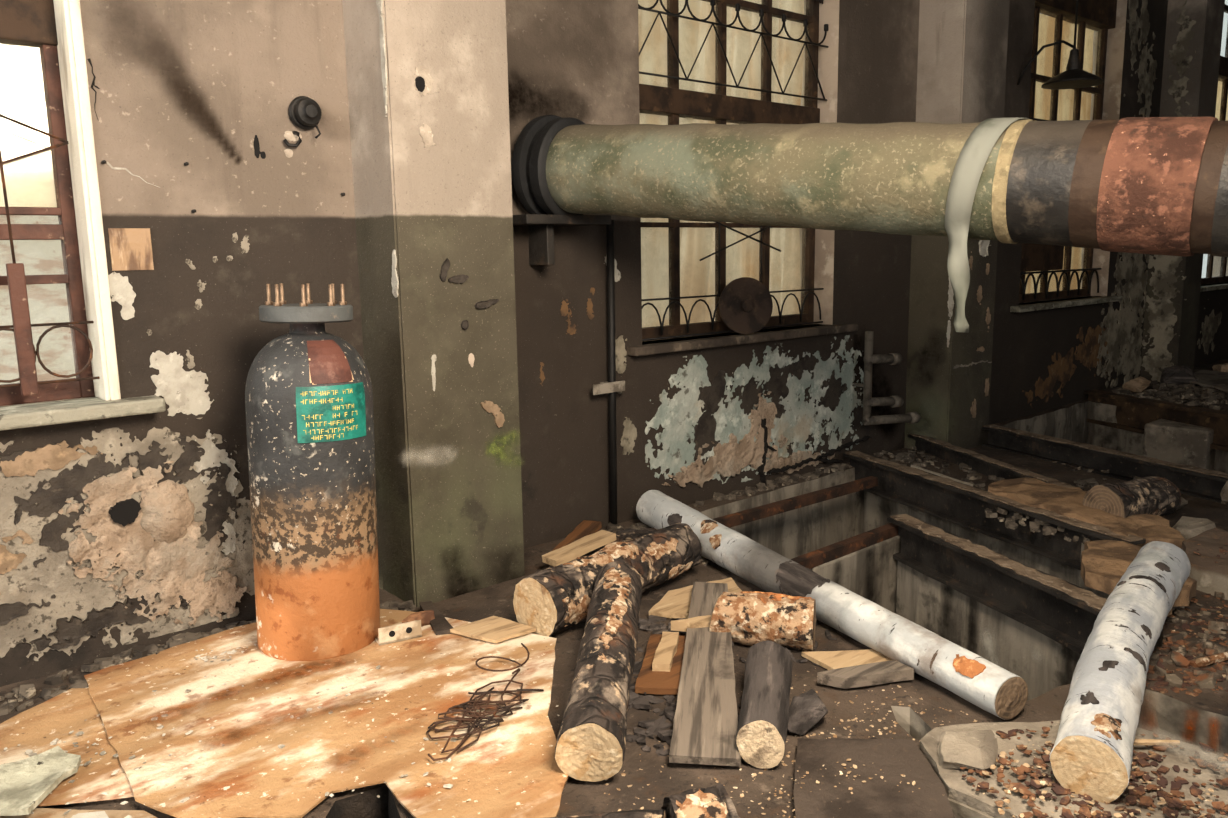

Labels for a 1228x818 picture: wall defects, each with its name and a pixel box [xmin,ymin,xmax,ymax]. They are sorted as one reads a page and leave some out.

leakage [161,58,240,163]
corrosion [1096,117,1218,257]
peeling [108,272,136,320]
spalling [185,259,207,310]
spalling [212,229,250,263]
peeling [615,335,627,374]
peeling [621,335,864,488]
peeling [0,350,255,661]